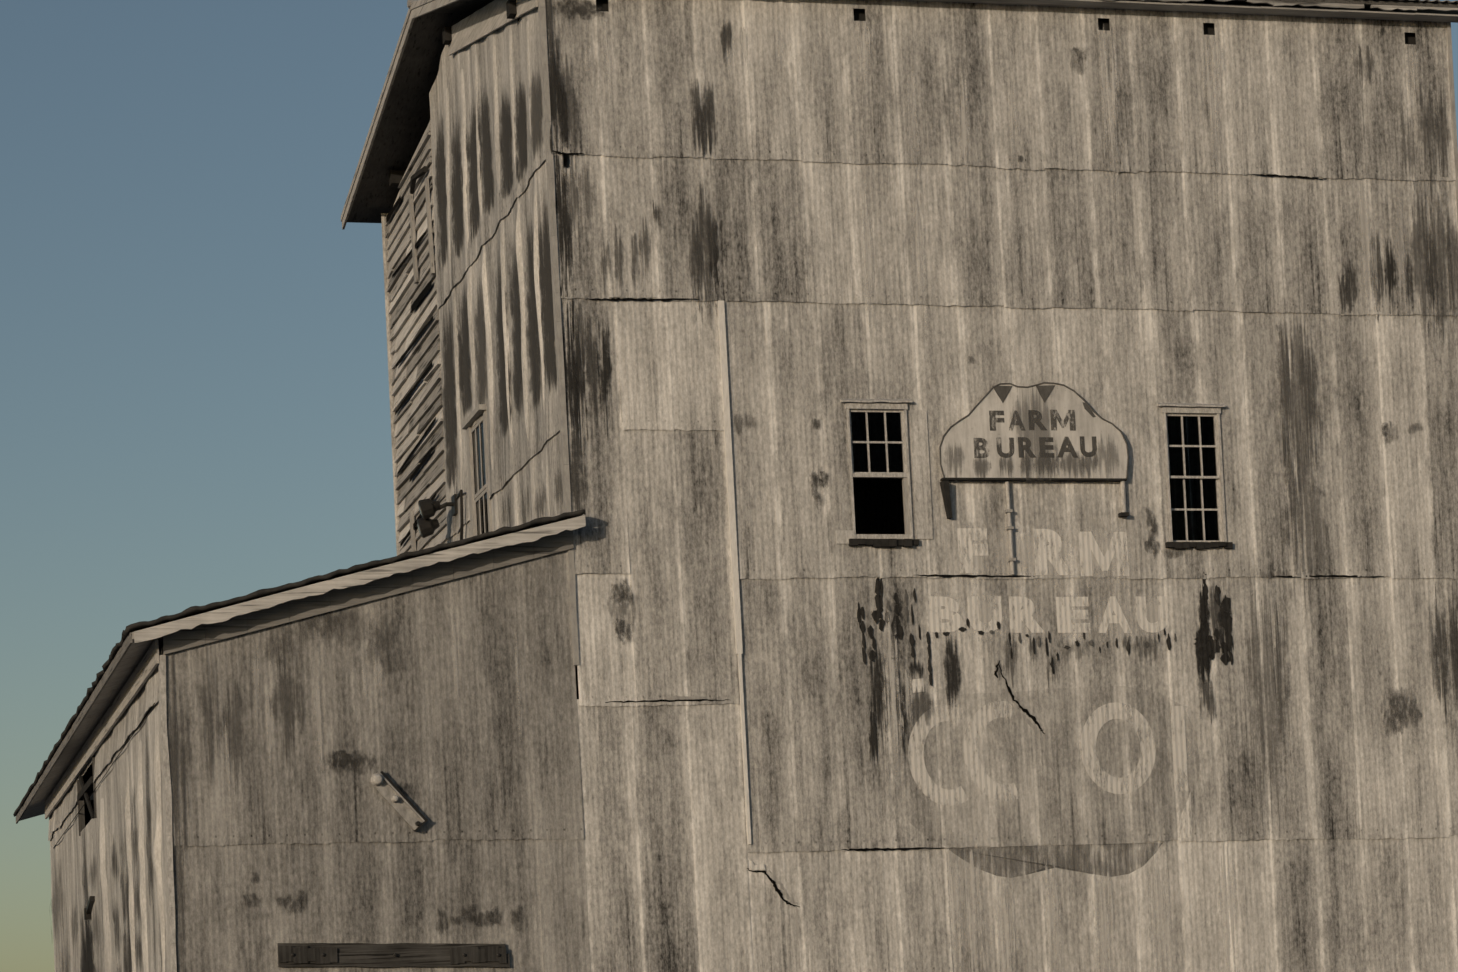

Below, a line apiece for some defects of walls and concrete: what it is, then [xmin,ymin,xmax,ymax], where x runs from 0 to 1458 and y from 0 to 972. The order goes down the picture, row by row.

corrosion [720,22,731,57]
corrosion [690,82,716,157]
corrosion [435,0,612,543]
corrosion [1194,572,1234,723]
crack [994,660,1054,771]
crack [747,860,800,946]